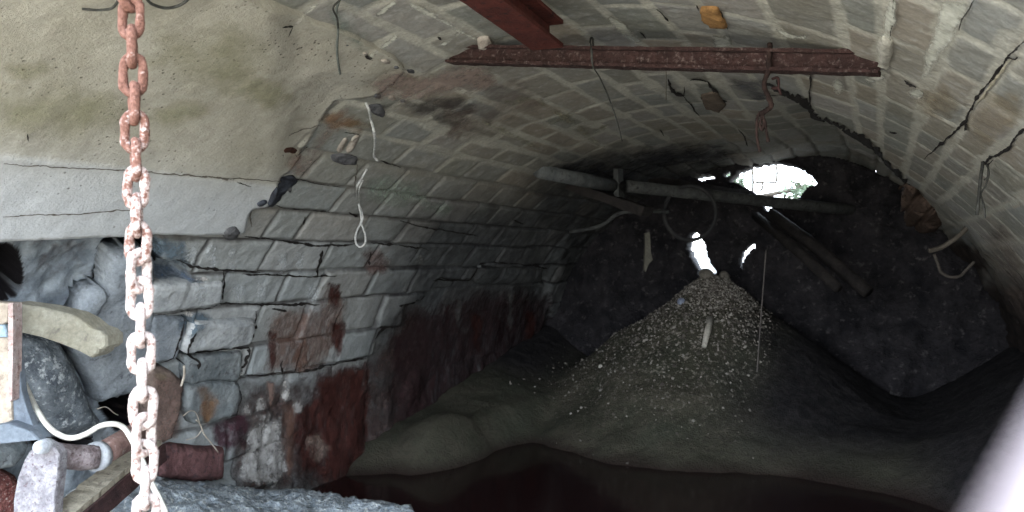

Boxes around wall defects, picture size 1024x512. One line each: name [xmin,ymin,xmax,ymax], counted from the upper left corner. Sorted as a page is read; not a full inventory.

leakage [416,98,471,119]
crack [767,75,911,186]
crack [925,41,1024,158]
crack [984,128,1024,165]
crack [9,134,547,377]
corrosion [268,283,345,374]
corrosion [202,396,248,448]
corrosion [284,364,369,481]